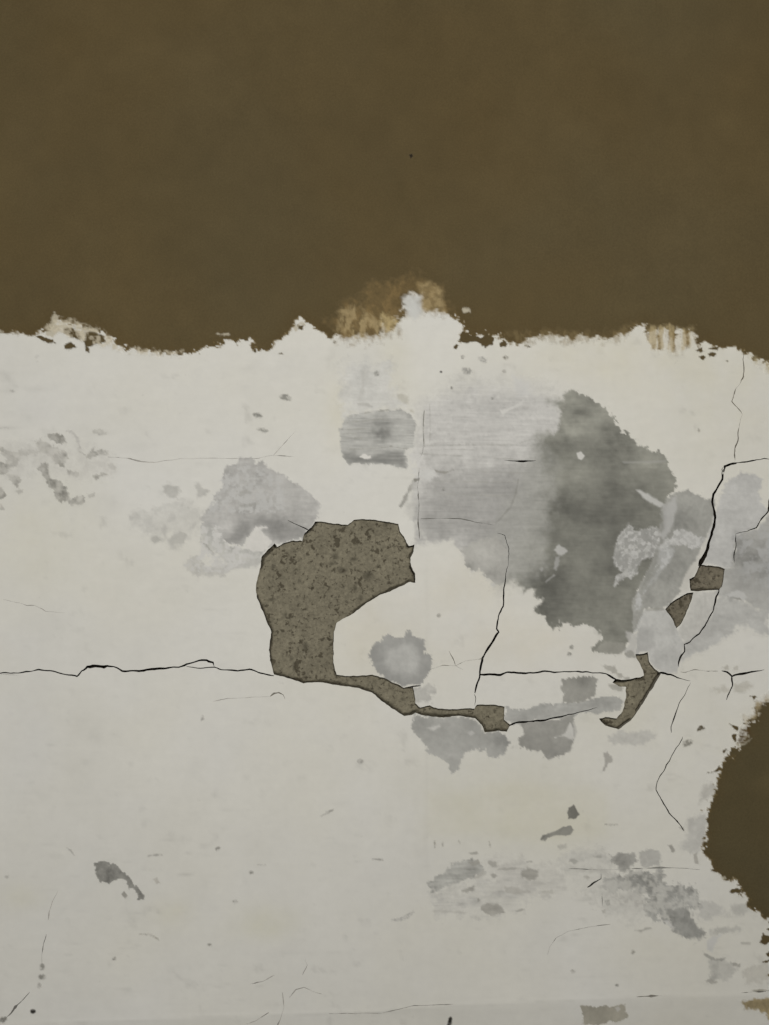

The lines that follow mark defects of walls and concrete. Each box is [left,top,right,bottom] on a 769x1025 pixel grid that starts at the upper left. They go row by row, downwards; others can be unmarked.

damp [332,278,471,344]
peeling [127,350,769,775]
crack [410,410,617,702]
crack [698,355,769,567]
crack [0,659,285,702]
crack [509,708,594,726]
crack [656,589,762,831]
peeling [93,859,145,901]